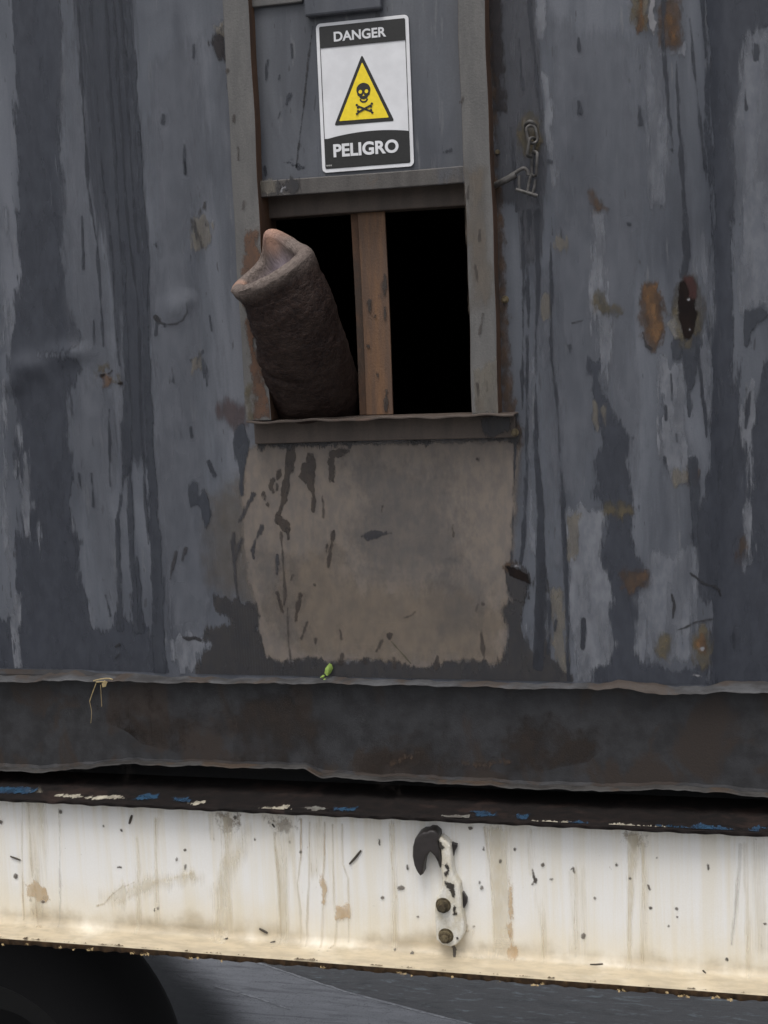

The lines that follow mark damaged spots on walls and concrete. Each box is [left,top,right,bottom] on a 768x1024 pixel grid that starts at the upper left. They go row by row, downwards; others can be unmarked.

rust [631,0,686,57]
rust [216,304,270,429]
rust [240,229,260,275]
peeling [588,209,613,385]
rust [639,282,666,352]
peeling [657,355,690,484]
peeling [739,380,756,489]
peeling [6,593,22,668]
peeling [171,631,212,674]
peeling [545,502,616,682]
peeling [634,545,698,664]
rust [27,881,48,903]